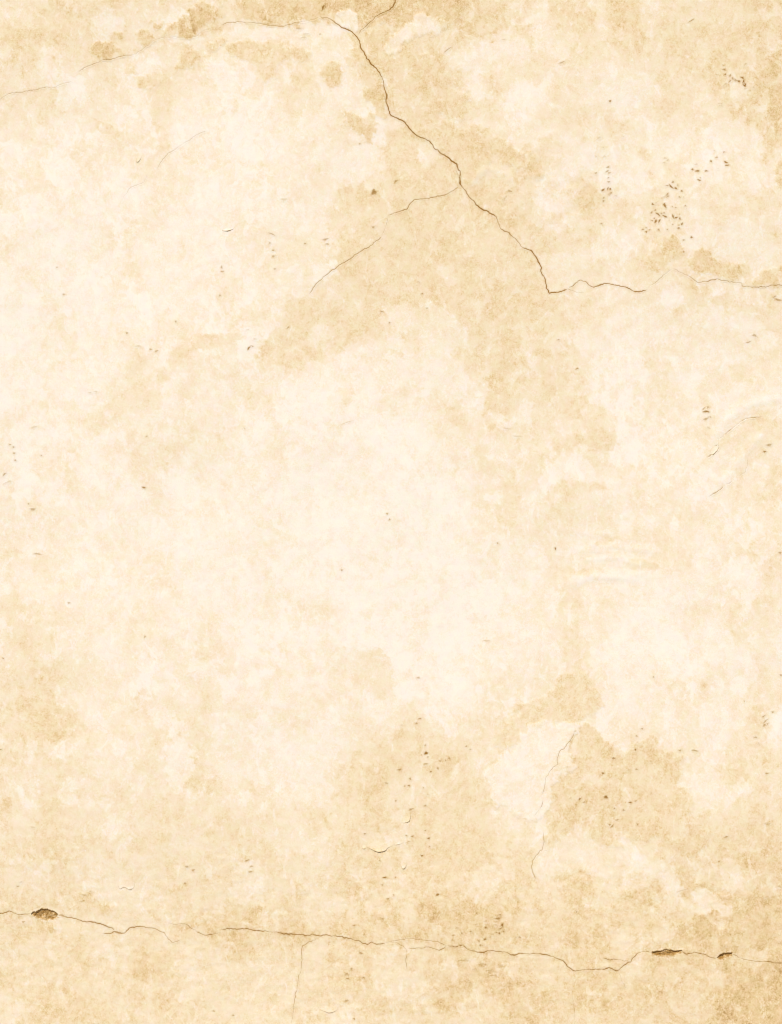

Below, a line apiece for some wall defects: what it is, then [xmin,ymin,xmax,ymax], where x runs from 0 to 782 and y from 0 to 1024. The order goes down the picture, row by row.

crack [0,0,782,295]
crack [0,909,31,917]
flaking render [20,906,60,924]
flaking render [649,947,686,958]
crack [681,950,782,965]
crack [57,913,652,1024]